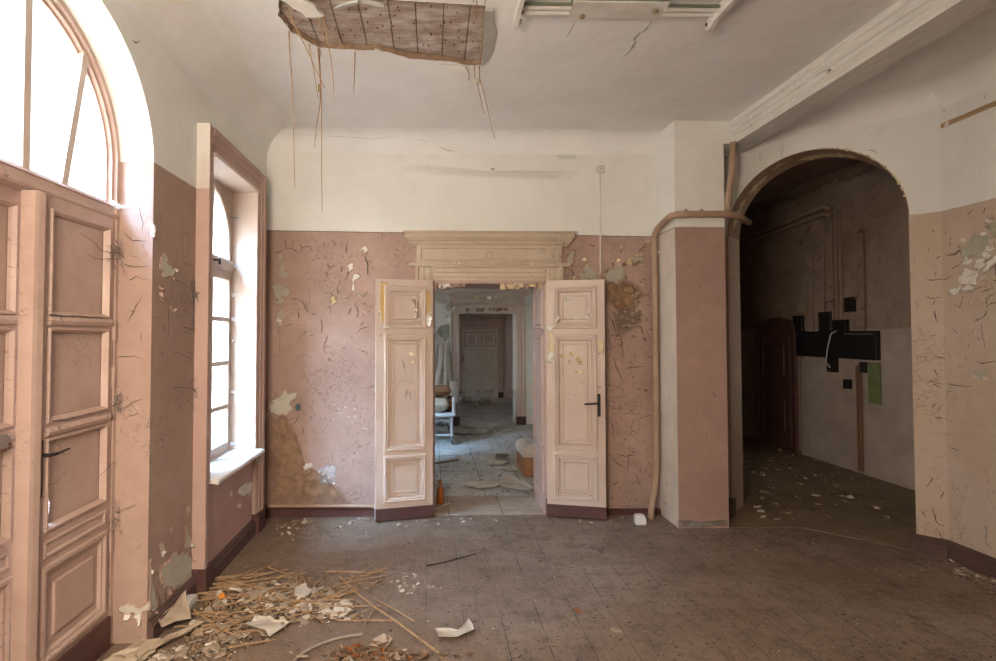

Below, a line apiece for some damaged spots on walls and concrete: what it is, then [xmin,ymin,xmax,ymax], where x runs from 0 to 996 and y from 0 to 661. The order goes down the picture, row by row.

crack [624,19,656,57]
crack [127,285,192,361]
crack [276,237,375,361]
peeling [347,246,369,292]
peeling [566,239,661,317]
crack [925,230,996,387]
peeling [947,218,996,295]
water stain [270,417,343,503]
crack [921,478,945,539]
flaking render [117,504,195,627]